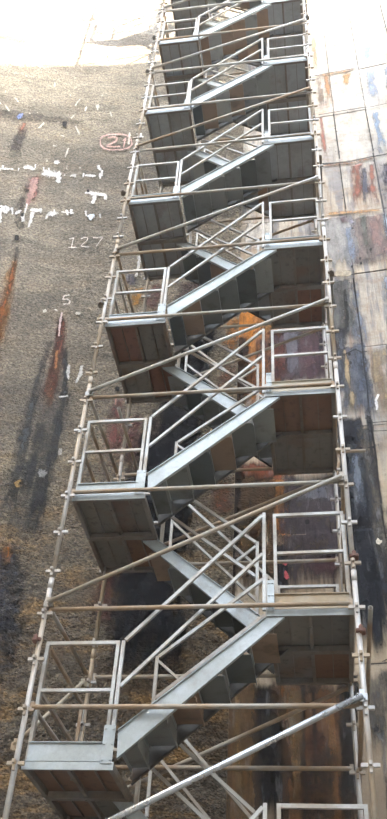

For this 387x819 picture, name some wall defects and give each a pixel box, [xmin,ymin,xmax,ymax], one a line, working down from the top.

water stain [241,206,270,247]
corrosion [326,157,387,264]
corrosion [0,247,19,338]
corrosion [44,312,66,399]
water stain [4,342,83,533]
water stain [237,214,387,647]
water stain [232,465,243,596]